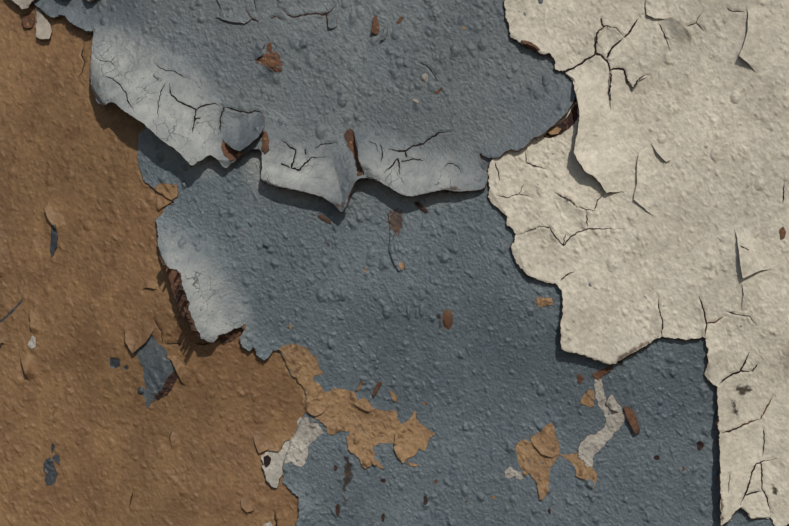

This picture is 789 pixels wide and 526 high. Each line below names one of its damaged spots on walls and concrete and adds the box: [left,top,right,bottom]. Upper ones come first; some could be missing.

crack [153,63,262,132]
crack [552,18,647,109]
peeling [11,0,706,366]
crack [370,131,453,175]
crack [521,193,623,246]
peeling [734,212,786,279]
peeling [124,315,189,409]
peeling [153,183,435,526]
crack [720,353,758,383]
peeling [505,378,640,500]
peeling [707,374,771,526]
crack [722,397,773,508]